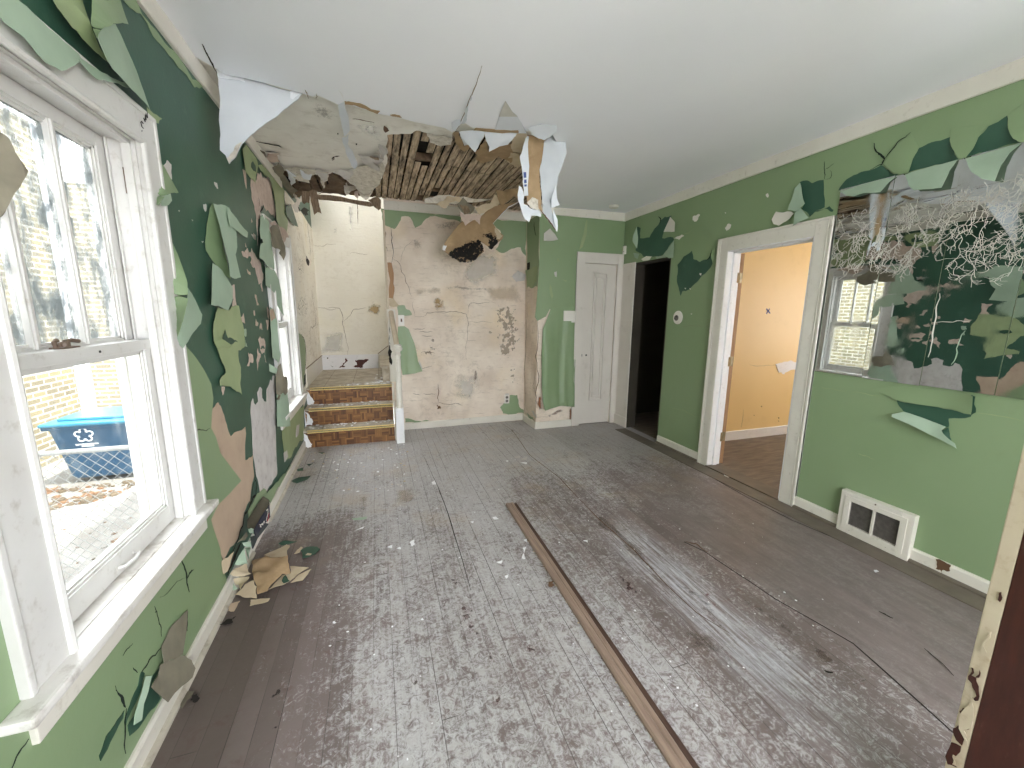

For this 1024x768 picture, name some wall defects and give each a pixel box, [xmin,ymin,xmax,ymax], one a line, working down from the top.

peeling [0,0,162,124]
peeling [199,59,219,88]
peeling [156,160,180,212]
peeling [772,103,1024,226]
peeling [172,83,485,575]
crack [386,328,394,365]
crack [396,242,491,409]
peeling [489,214,715,422]
peeling [851,386,976,449]
crack [154,561,193,637]
peeling [99,610,196,761]
peeling [945,667,981,768]